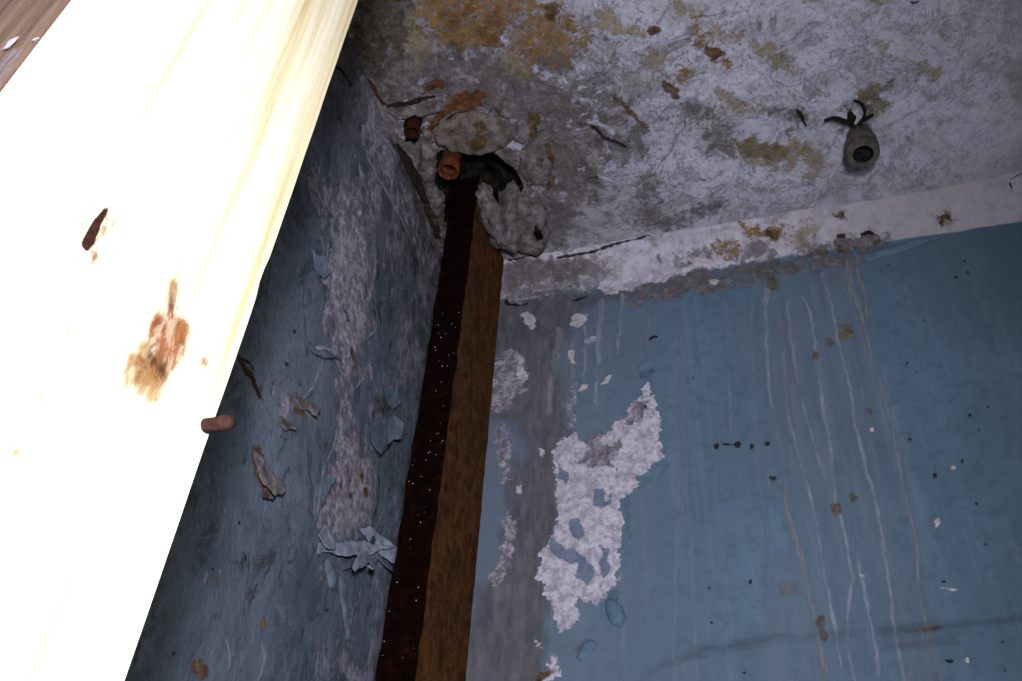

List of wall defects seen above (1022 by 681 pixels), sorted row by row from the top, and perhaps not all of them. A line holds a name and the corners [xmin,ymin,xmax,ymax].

damp [674,0,745,70]
damp [348,0,661,302]
damp [633,174,725,232]
damp [638,50,822,179]
damp [835,78,894,134]
rust [124,280,189,401]
flaking render [270,71,890,572]
peeling [486,511,517,588]
damp [466,299,605,681]
peeling [534,361,669,633]
damp [615,218,938,681]